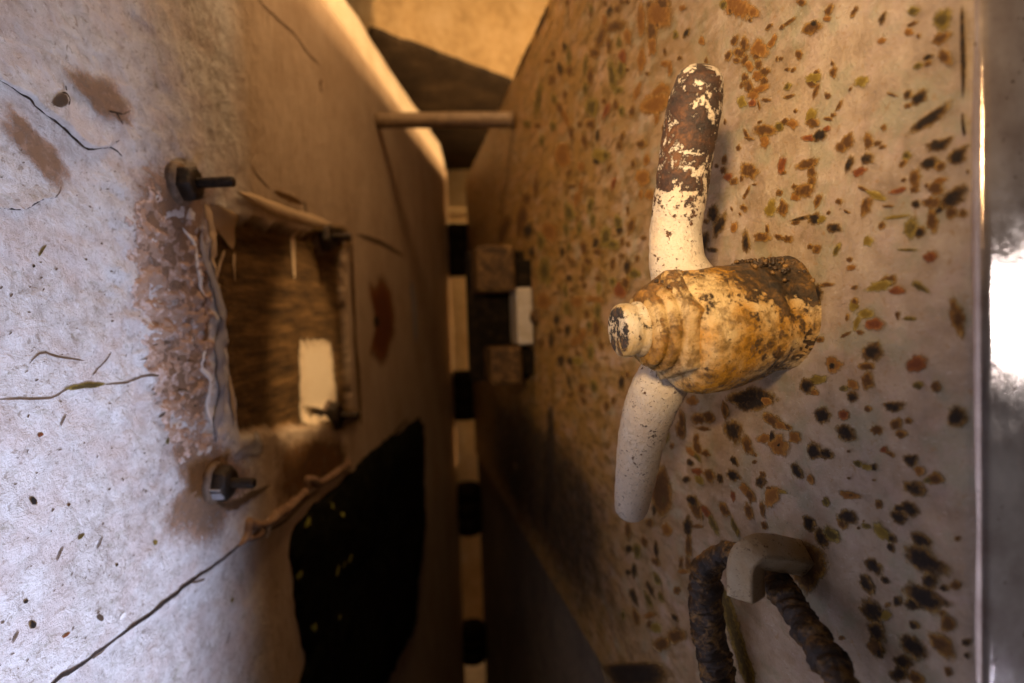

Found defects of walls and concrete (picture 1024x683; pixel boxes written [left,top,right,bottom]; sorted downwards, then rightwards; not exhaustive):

damp [932,8,952,32]
damp [2,106,70,187]
crack [1,81,123,157]
damp [68,71,133,127]
corrosion [714,0,852,233]
damp [854,76,869,88]
corrosion [556,131,654,350]
damp [884,214,918,251]
spalling [124,166,239,464]
corrosion [793,541,829,595]
crack [53,545,238,683]
corrosion [722,589,755,683]